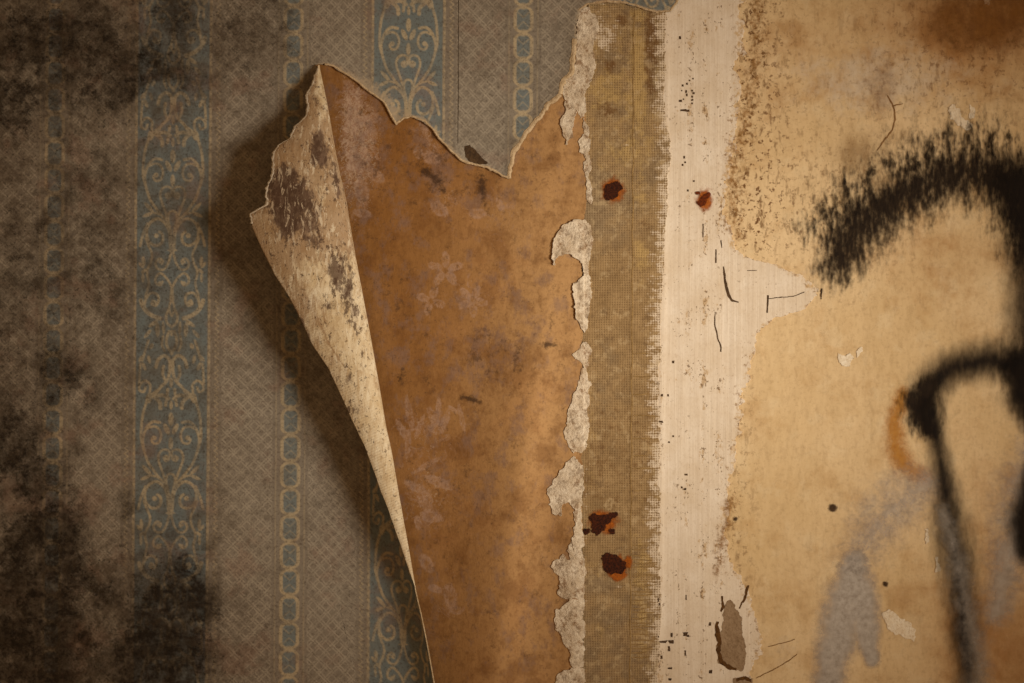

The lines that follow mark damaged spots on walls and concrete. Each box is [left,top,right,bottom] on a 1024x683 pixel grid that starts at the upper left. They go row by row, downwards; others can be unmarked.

peeling [464,145,488,165]
rust [603,178,625,201]
rust [695,191,712,211]
peeling [249,65,435,683]
mould [0,410,89,683]
rust [583,511,618,536]
rust [601,553,632,581]
mould [117,555,220,683]
hole [658,632,689,681]
spalling [709,585,753,683]